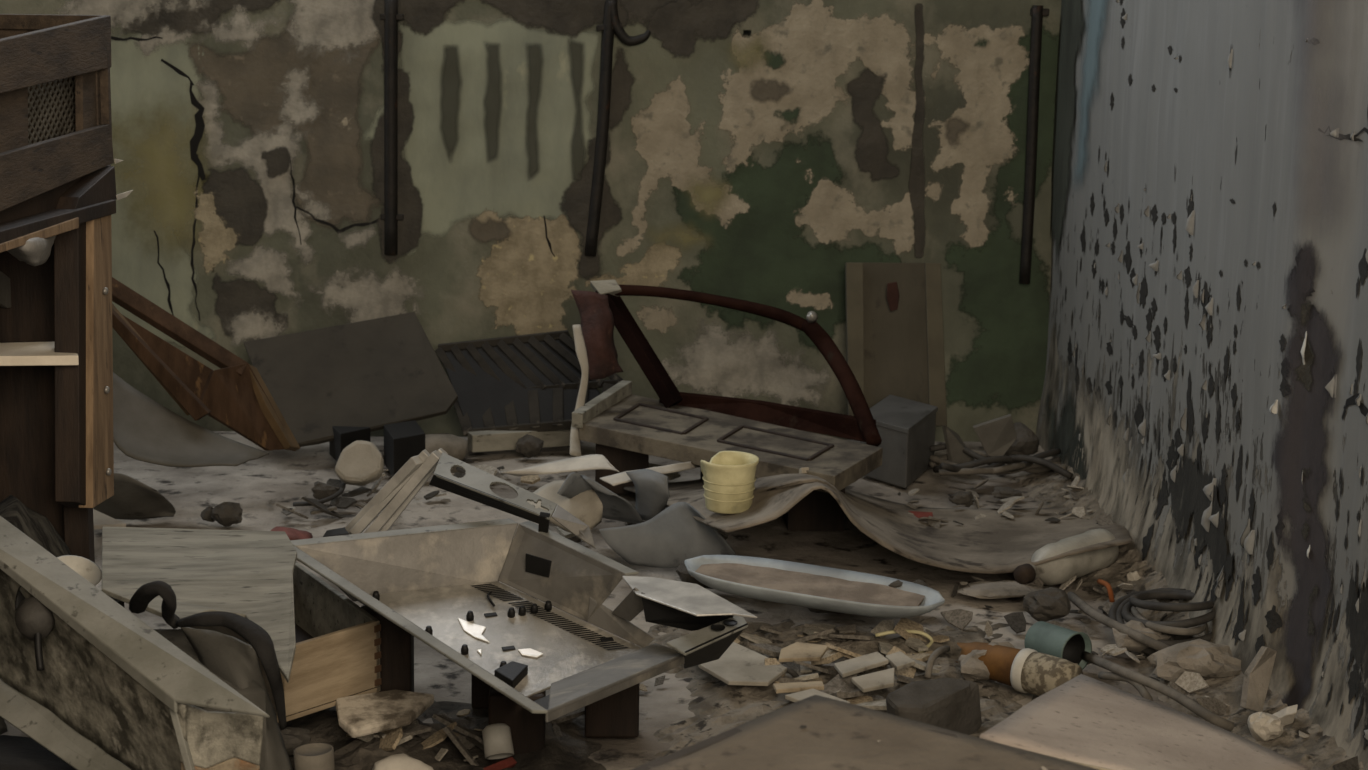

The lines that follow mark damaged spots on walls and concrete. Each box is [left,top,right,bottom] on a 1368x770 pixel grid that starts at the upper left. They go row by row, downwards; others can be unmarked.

crack [111,36,206,321]
peeling [110,33,330,347]
spalling [342,227,375,249]
spalling [469,0,1030,335]
peeling [1050,0,1085,263]
peeling [1115,0,1127,49]
spalling [1045,151,1285,654]
peeling [1269,331,1307,414]
peeling [1325,339,1362,400]
crack [1327,109,1368,141]
peeling [1356,248,1368,298]
peeling [1320,465,1368,749]